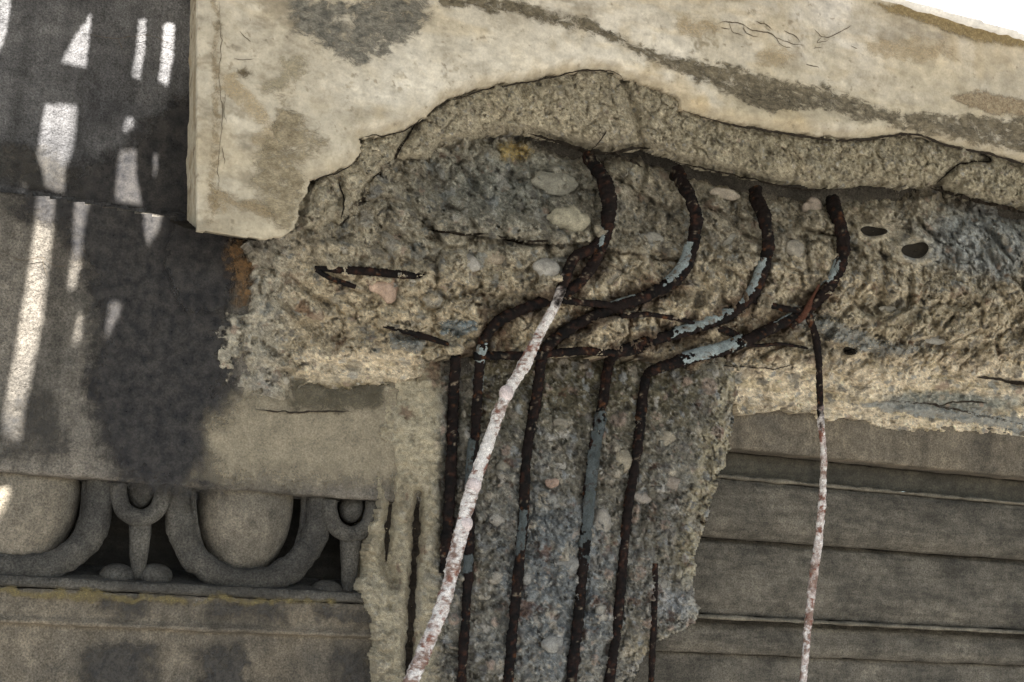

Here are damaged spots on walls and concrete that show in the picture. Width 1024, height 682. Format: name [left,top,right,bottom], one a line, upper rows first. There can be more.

leakage [290,0,1024,152]
crack [718,21,857,67]
peeling [953,89,1024,116]
corrosion [224,240,254,307]
spalling [205,135,1024,682]